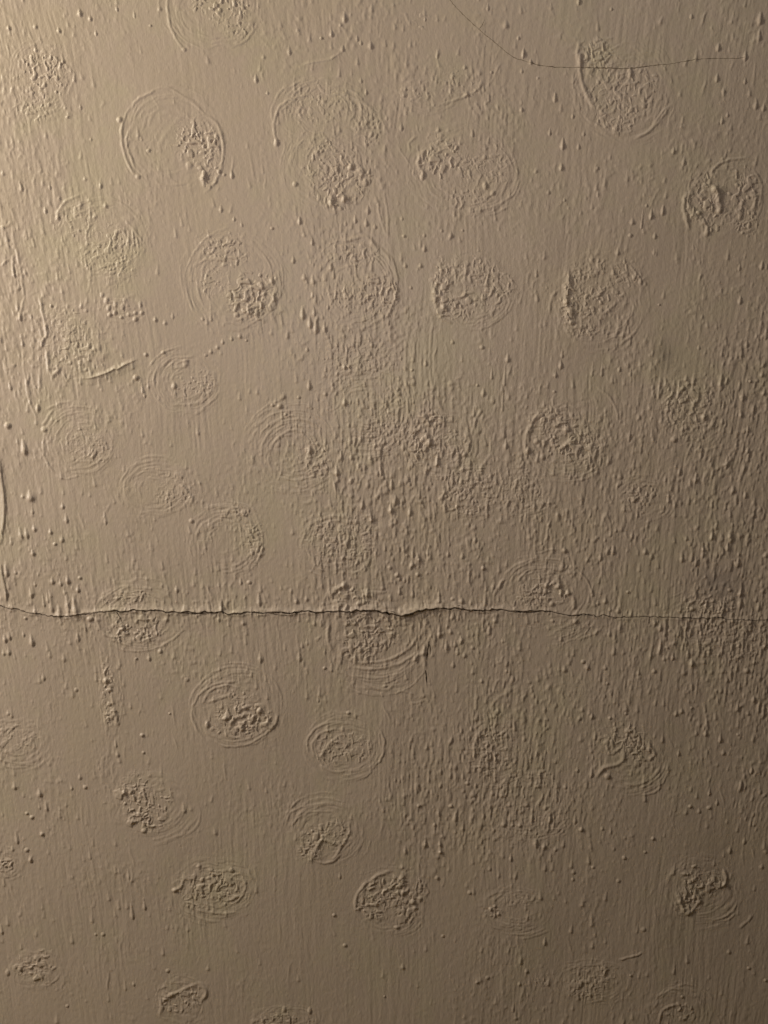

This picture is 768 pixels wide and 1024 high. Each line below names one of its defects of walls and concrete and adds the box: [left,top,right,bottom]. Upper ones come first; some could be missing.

crack [0,595,768,683]